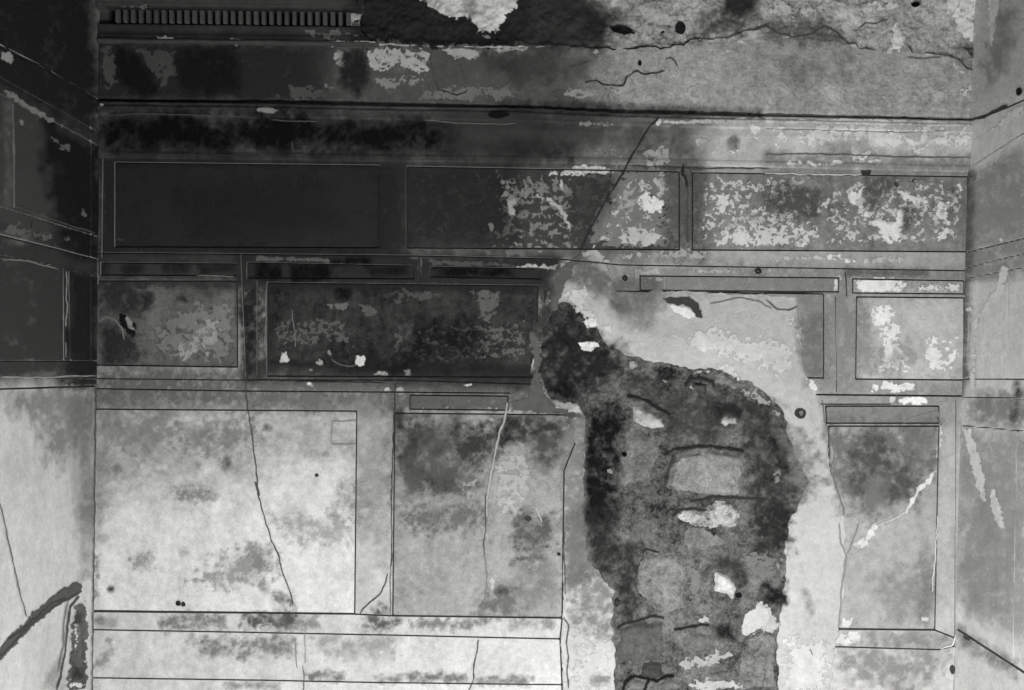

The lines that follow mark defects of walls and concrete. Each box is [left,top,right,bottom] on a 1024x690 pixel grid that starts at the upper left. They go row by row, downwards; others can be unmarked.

crack [0,40,1008,251]
spalling [304,0,974,127]
crack [491,19,889,87]
damp [698,10,745,41]
crack [244,286,396,615]
damp [16,258,638,635]
crack [480,494,488,612]
spalling [374,144,963,690]